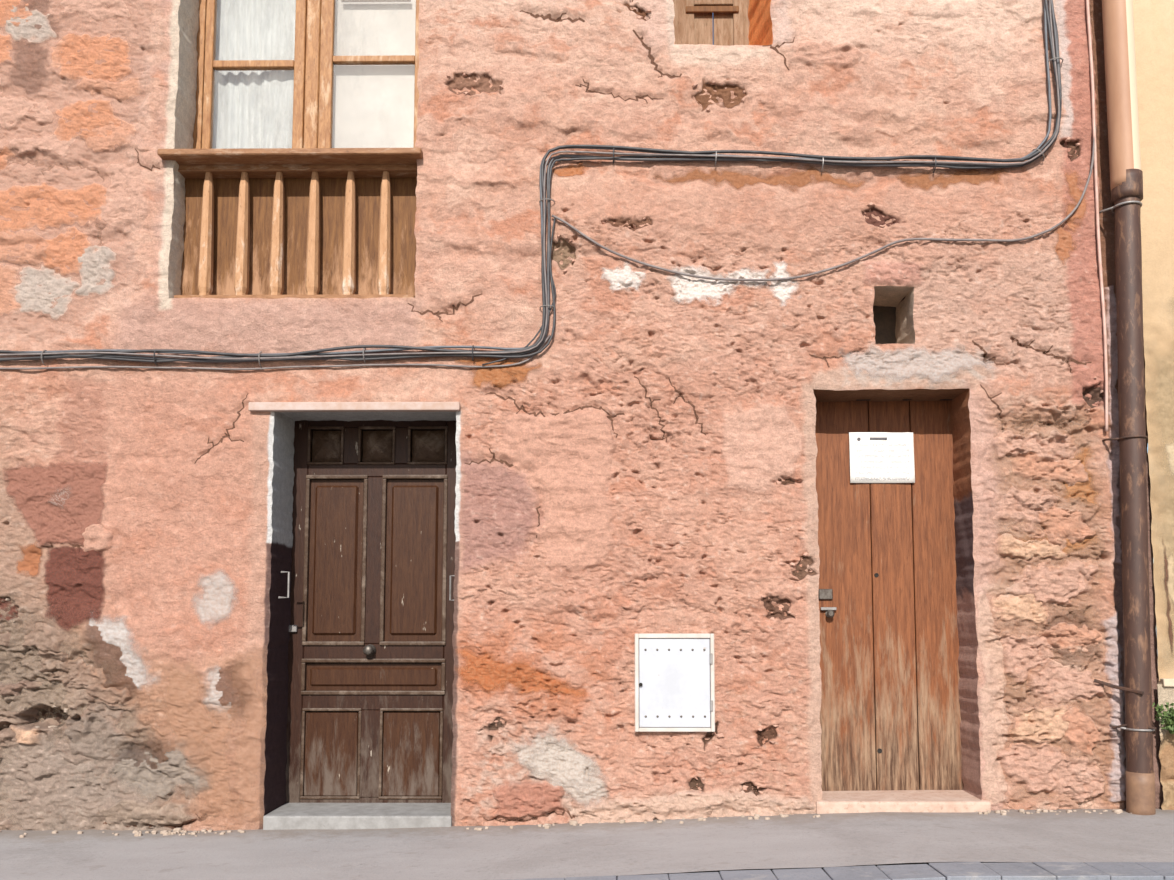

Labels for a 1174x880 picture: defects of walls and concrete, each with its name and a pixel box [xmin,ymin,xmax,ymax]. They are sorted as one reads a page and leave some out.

spalling [446,73,503,96]
crack [576,30,682,104]
spalling [692,81,747,112]
flaking render [0,0,150,322]
spalling [862,202,900,228]
crack [195,394,248,463]
spalling [761,595,795,620]
spalling [0,597,132,761]